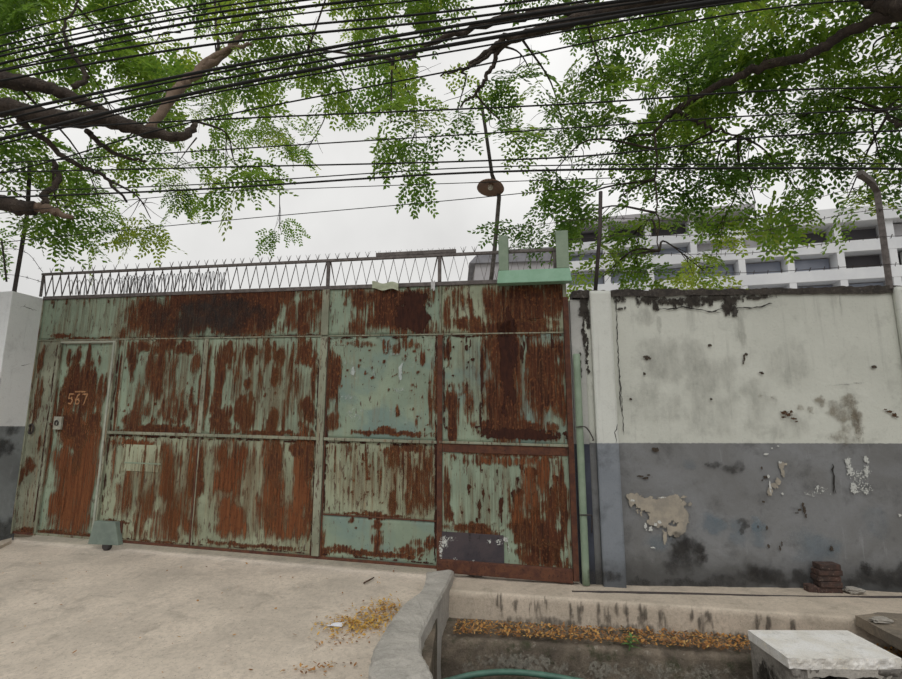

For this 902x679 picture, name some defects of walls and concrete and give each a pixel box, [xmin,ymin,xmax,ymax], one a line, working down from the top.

leakage [613,294,777,317]
rust [14,284,572,568]
leakage [809,395,862,431]
peeling [761,462,787,496]
peeling [845,456,871,495]
peeling [626,493,692,545]